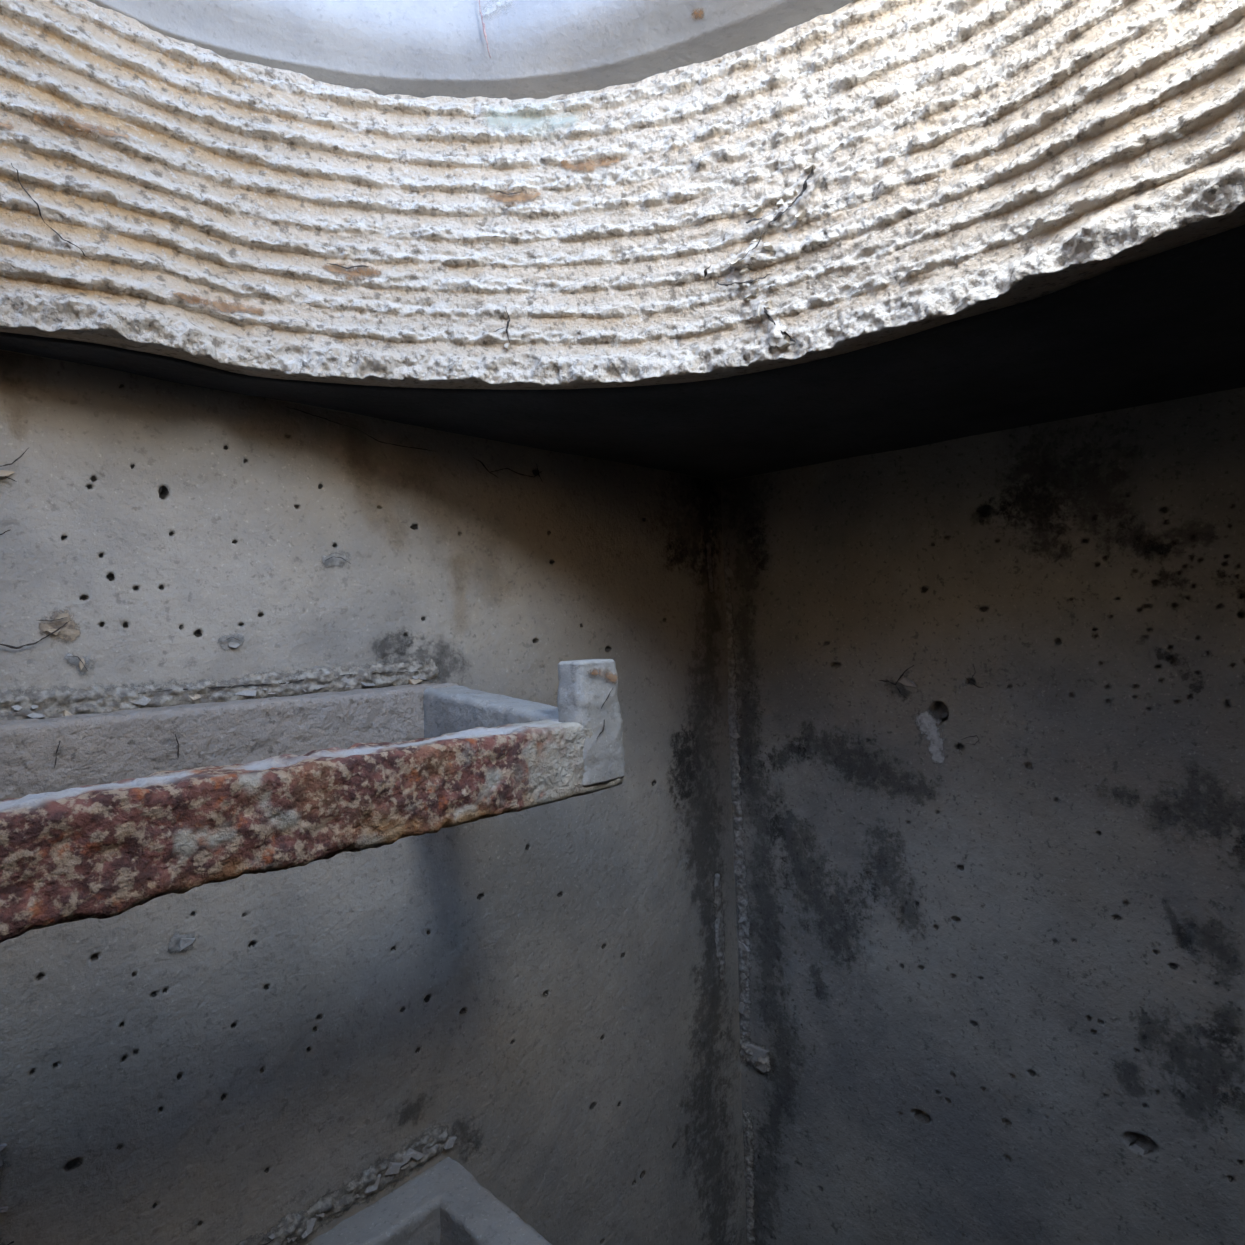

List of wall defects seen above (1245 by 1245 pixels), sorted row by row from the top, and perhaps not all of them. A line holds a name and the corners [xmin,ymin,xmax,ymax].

crack [704,165,821,350]
spalling [0,450,27,482]
spalling [0,610,89,675]
water stain [915,711,945,764]